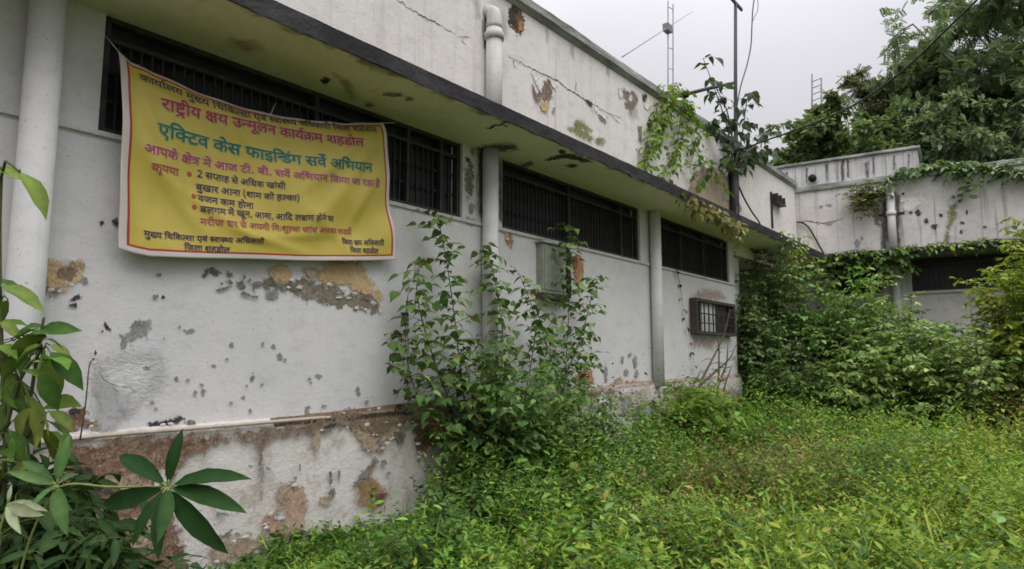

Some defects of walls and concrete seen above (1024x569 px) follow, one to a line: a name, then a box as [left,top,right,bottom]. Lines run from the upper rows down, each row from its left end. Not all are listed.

crack [398,0,470,42]
flaking render [508,4,527,35]
flaking render [531,71,558,115]
crack [509,56,620,121]
flaking render [618,86,639,113]
peeling [45,257,88,307]
peeling [202,260,383,315]
peeling [101,319,151,349]
flaking render [54,401,228,569]
flaking render [210,464,341,566]